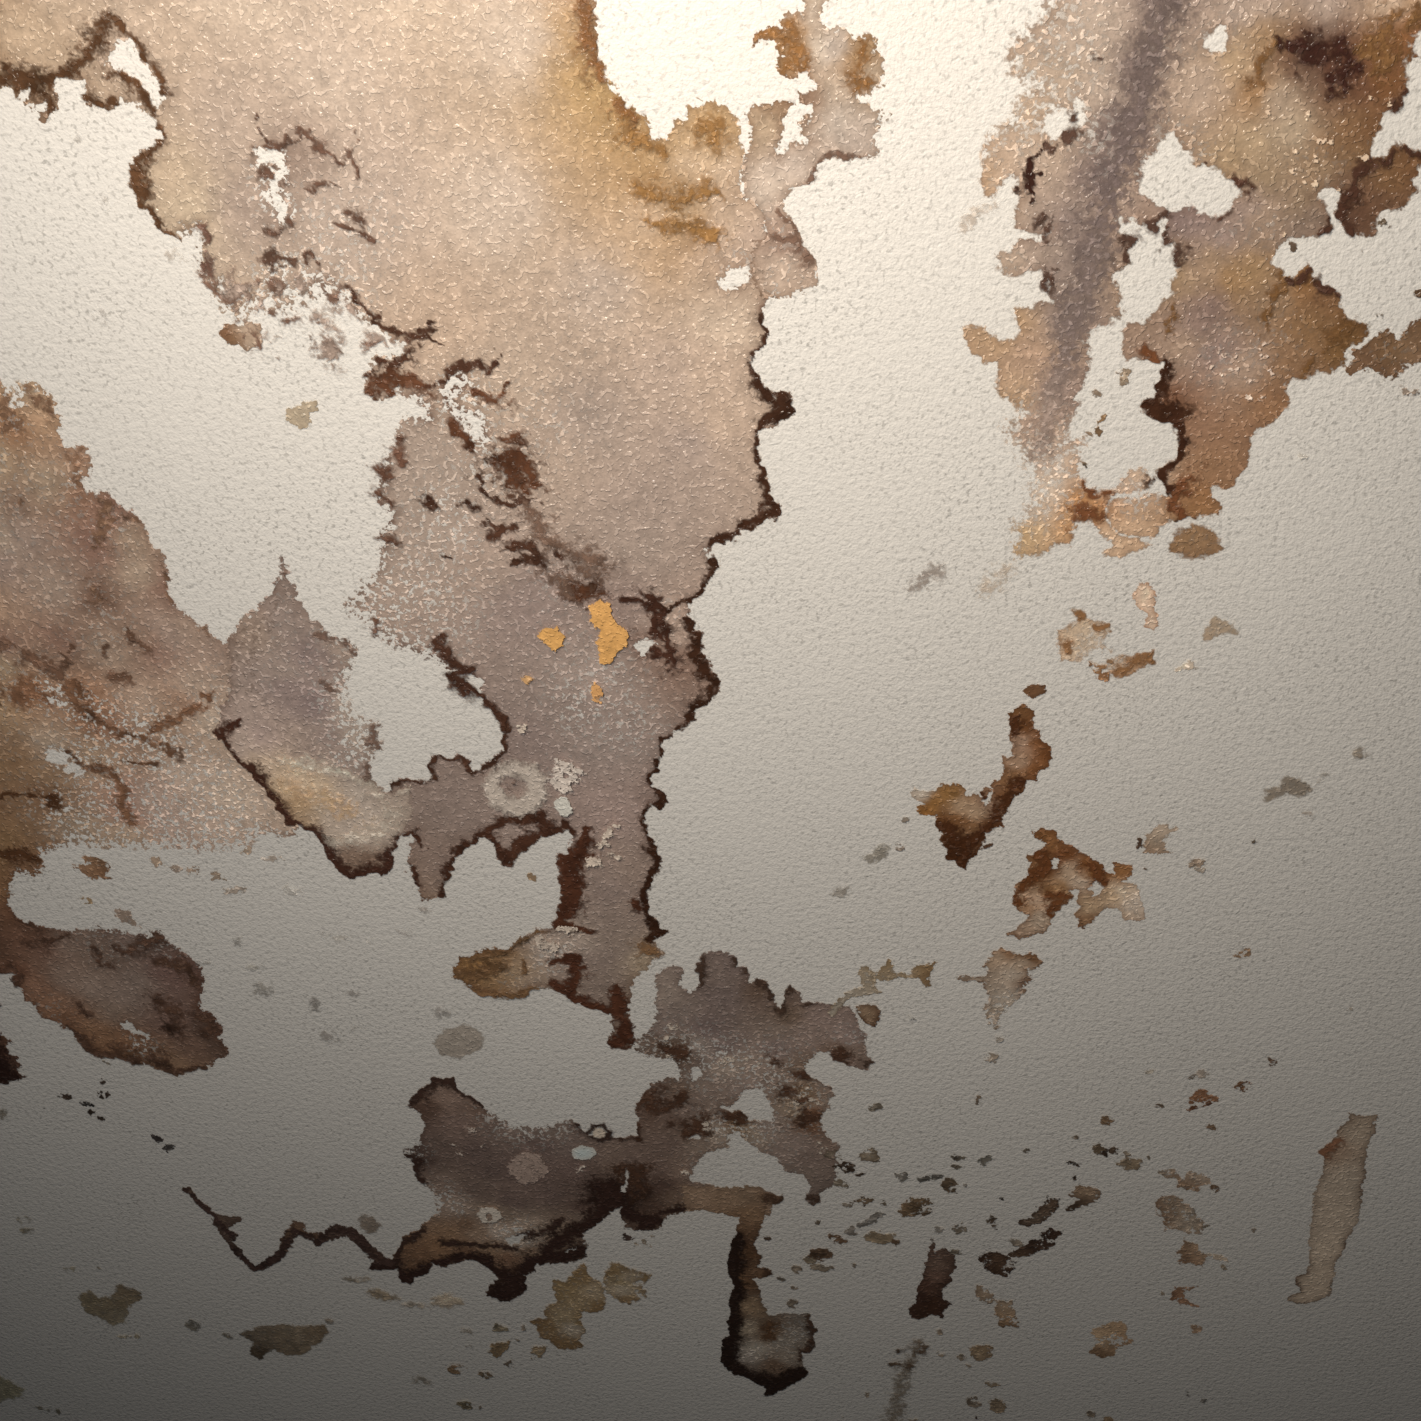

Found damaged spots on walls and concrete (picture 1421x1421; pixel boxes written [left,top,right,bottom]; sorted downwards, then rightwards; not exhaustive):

water stain [963,0,1421,559]
water stain [0,0,937,1396]
water stain [1022,684,1047,699]
water stain [956,947,1043,1063]
water stain [908,1239,957,1320]
water stain [885,1340,929,1421]